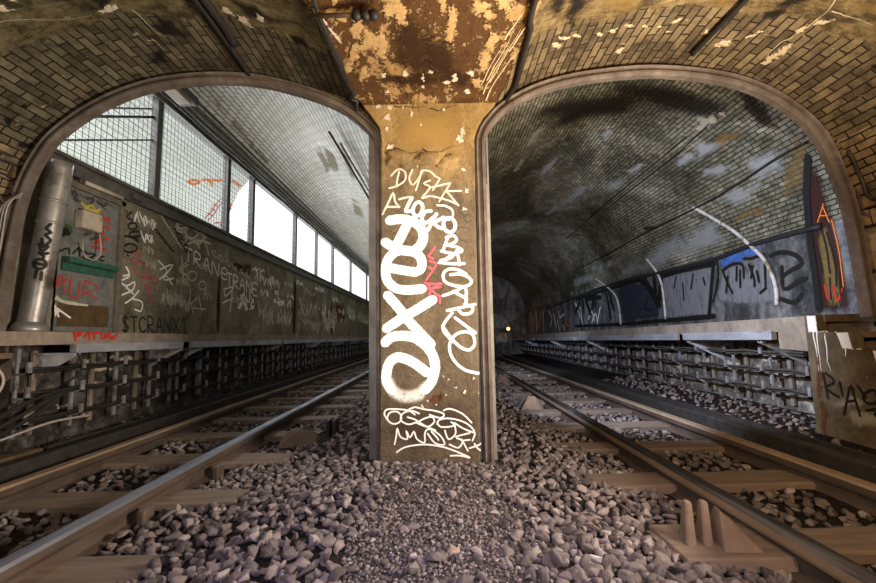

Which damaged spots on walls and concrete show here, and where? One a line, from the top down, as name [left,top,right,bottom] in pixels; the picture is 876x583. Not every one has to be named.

spalling [220,4,264,31]
flaking render [305,0,408,83]
damp [380,21,469,85]
flaking render [437,0,459,51]
flaking render [444,31,499,94]
flaking render [471,0,513,20]
damp [481,1,537,101]
spalling [596,18,681,36]
damp [679,144,719,165]
damp [728,190,747,200]